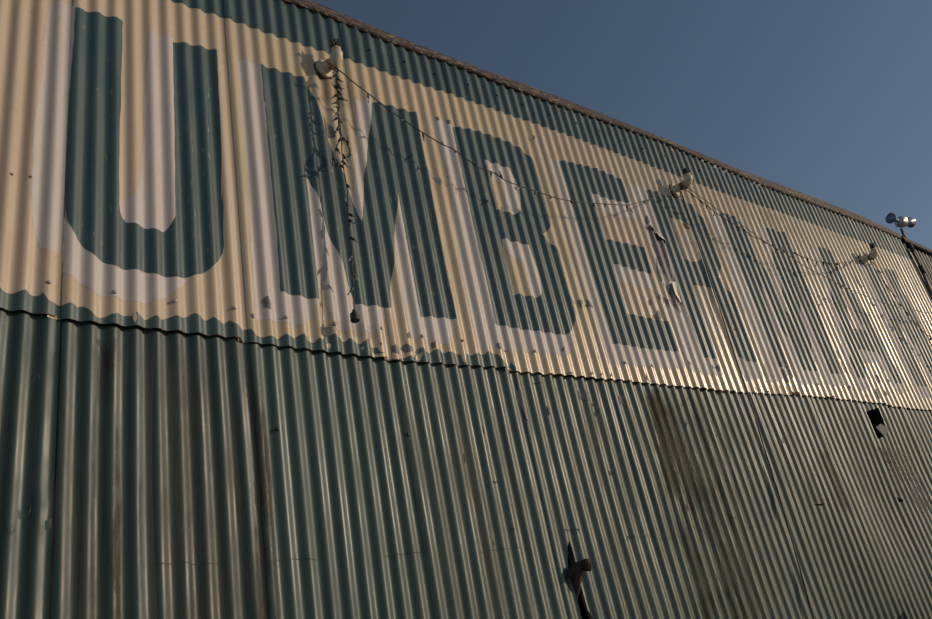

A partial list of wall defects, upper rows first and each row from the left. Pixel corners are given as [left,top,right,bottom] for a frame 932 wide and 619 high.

peeling [391,332,443,361]
peeling [644,216,683,319]
leakage [250,388,280,619]
leakage [644,390,757,619]